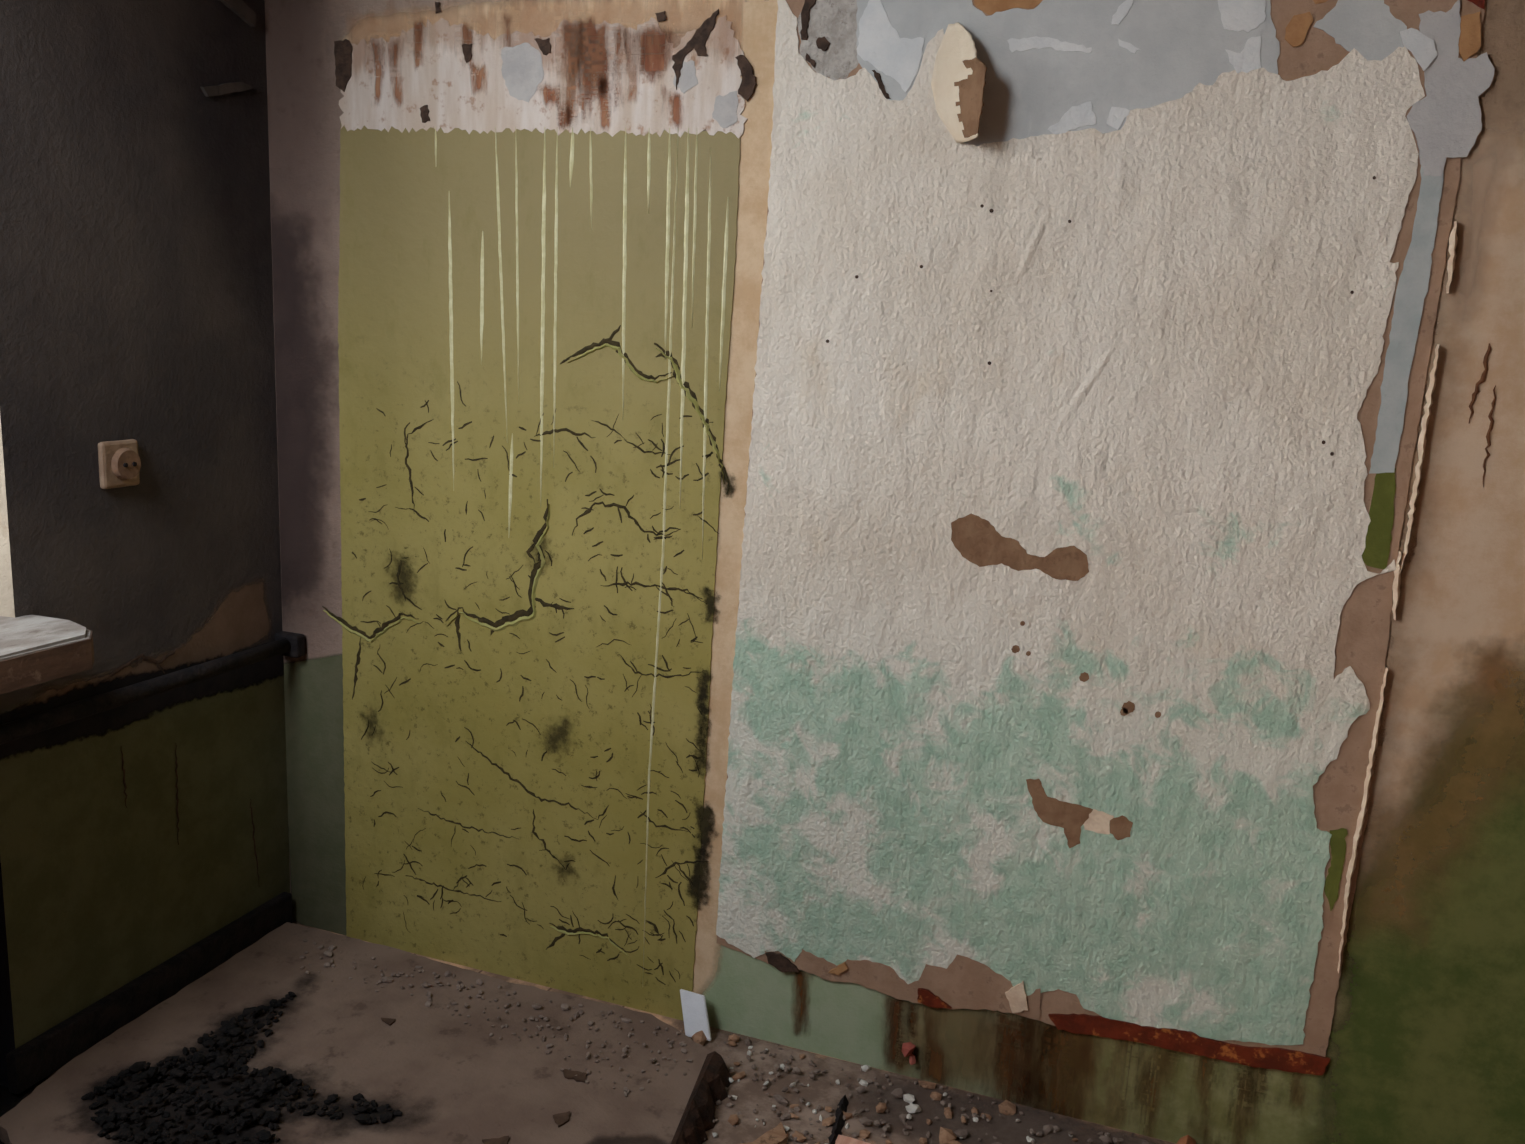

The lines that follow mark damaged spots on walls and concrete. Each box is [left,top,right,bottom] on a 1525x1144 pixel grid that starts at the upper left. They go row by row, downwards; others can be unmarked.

damp [480,127,519,538]
crack [322,325,730,985]
peeling [334,0,778,994]
damp [540,127,593,507]
damp [642,128,735,987]
peeling [951,513,1089,581]
peeling [797,0,1495,569]
crack [1469,343,1496,487]
corrosion [795,971,807,1034]
peeling [765,949,1041,1018]
corrosion [887,998,945,1085]
corrosion [991,1011,1091,1120]